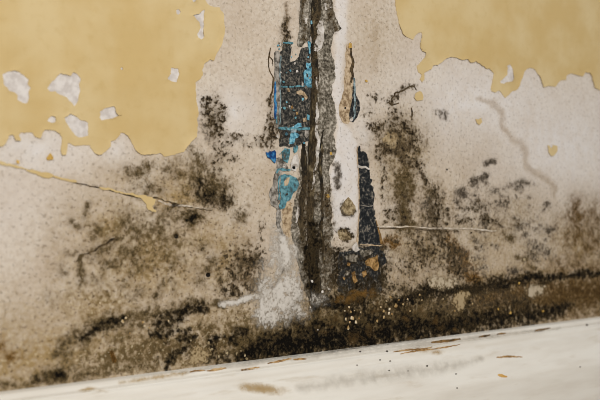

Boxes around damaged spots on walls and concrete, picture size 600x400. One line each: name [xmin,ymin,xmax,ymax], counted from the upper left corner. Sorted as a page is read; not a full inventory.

peeling [0,0,225,157]
peeling [395,0,600,98]
crack [0,161,213,212]
damp [1,95,600,388]
spalling [265,0,408,330]
crack [377,225,496,233]